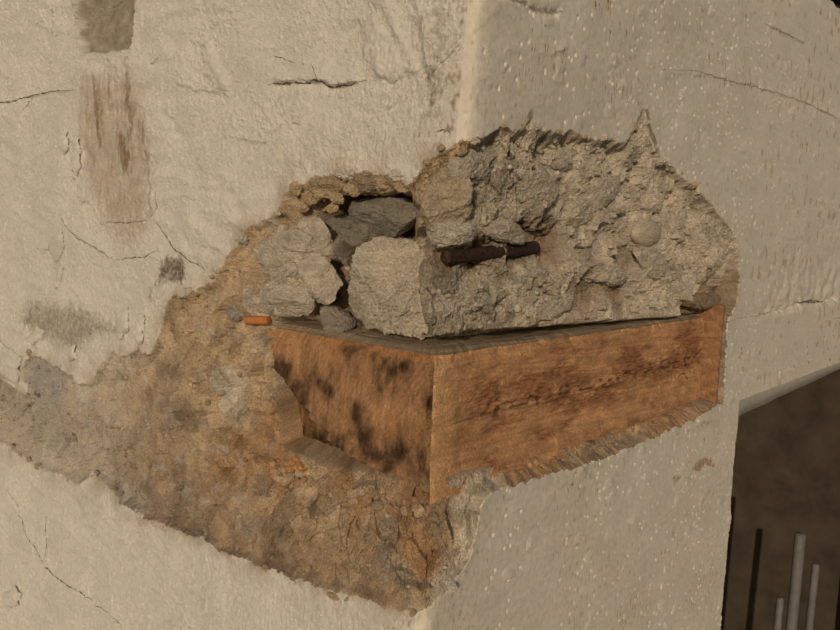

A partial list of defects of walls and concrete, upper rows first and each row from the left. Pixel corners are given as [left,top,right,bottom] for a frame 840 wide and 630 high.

crack [0,90,72,110]
crack [268,56,366,88]
crack [662,69,839,119]
spalling [0,109,740,618]